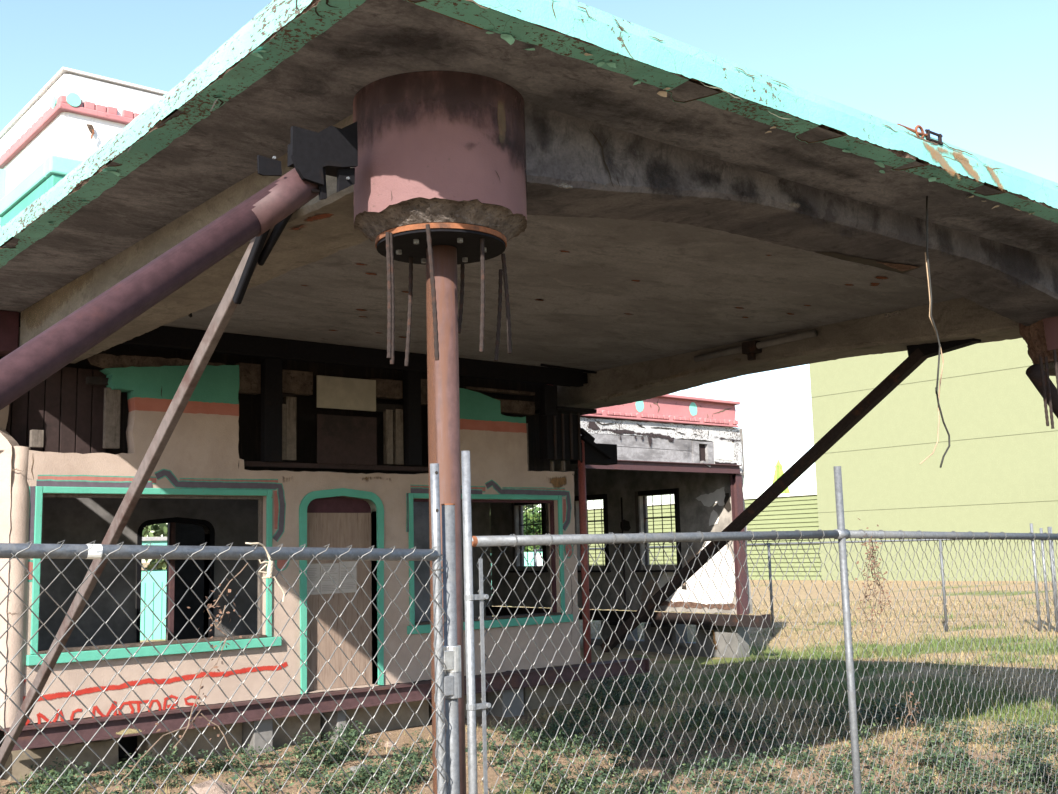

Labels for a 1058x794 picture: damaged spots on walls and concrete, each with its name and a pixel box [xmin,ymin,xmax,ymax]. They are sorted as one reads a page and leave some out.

peeling [408,0,535,50]
crack [552,2,663,59]
crack [701,67,792,100]
spalling [0,0,320,250]
spalling [469,1,1058,214]
damp [647,161,677,194]
spalling [354,197,527,242]
spalling [816,252,920,274]
spalling [1020,319,1058,365]
peeling [588,421,674,442]